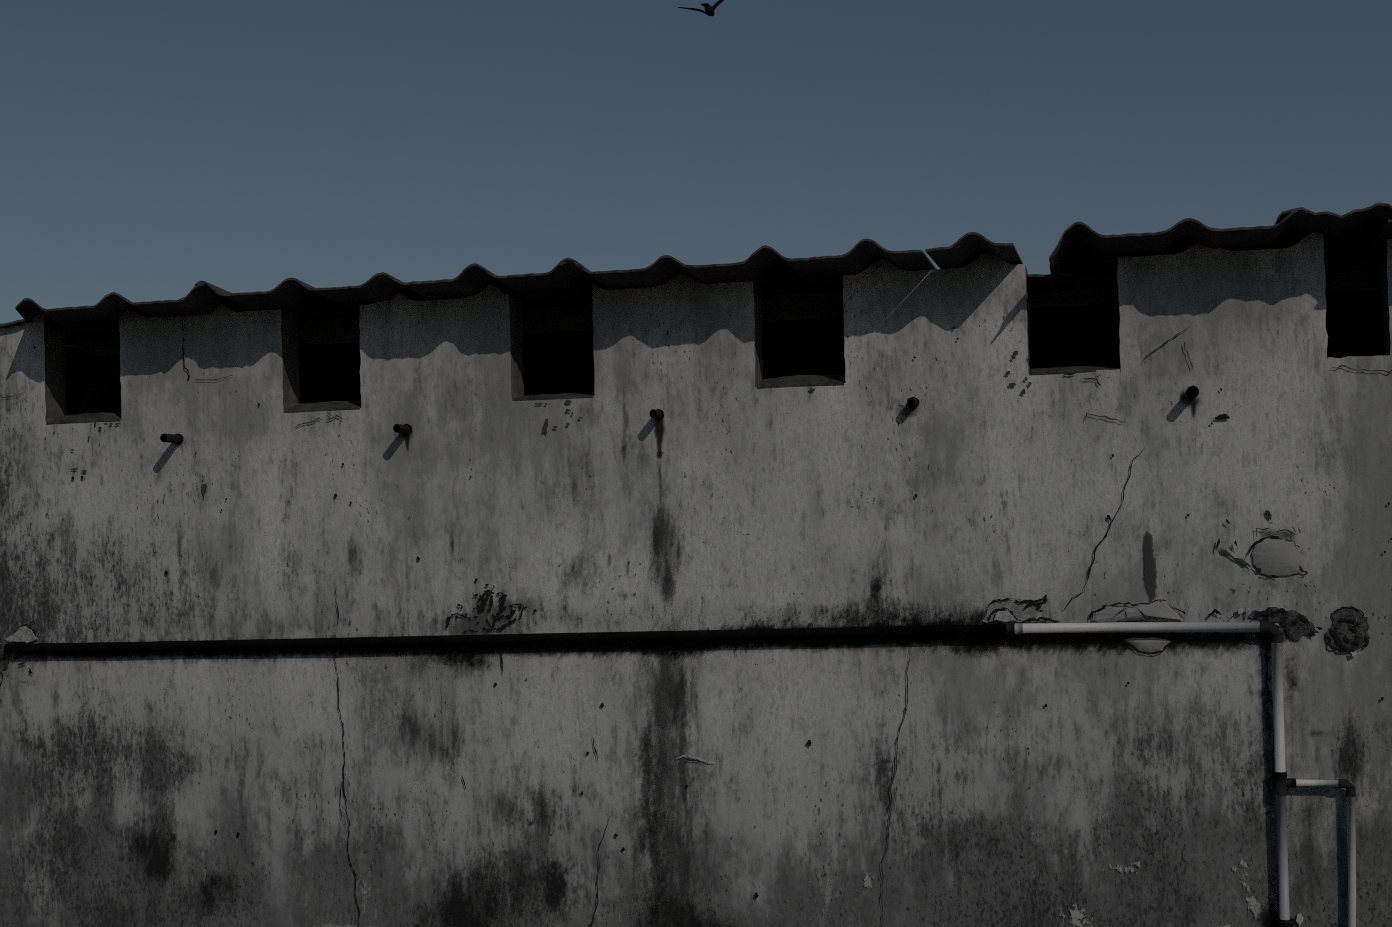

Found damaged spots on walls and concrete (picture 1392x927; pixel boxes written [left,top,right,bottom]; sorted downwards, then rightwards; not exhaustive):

crack [1144,326,1193,368]
crack [1064,373,1123,423]
leakage [655,419,664,485]
leakage [654,506,680,598]
crack [1065,450,1143,609]
spalling [446,578,537,635]
leakage [870,578,882,602]
crack [330,656,360,927]
leakage [14,603,1289,927]